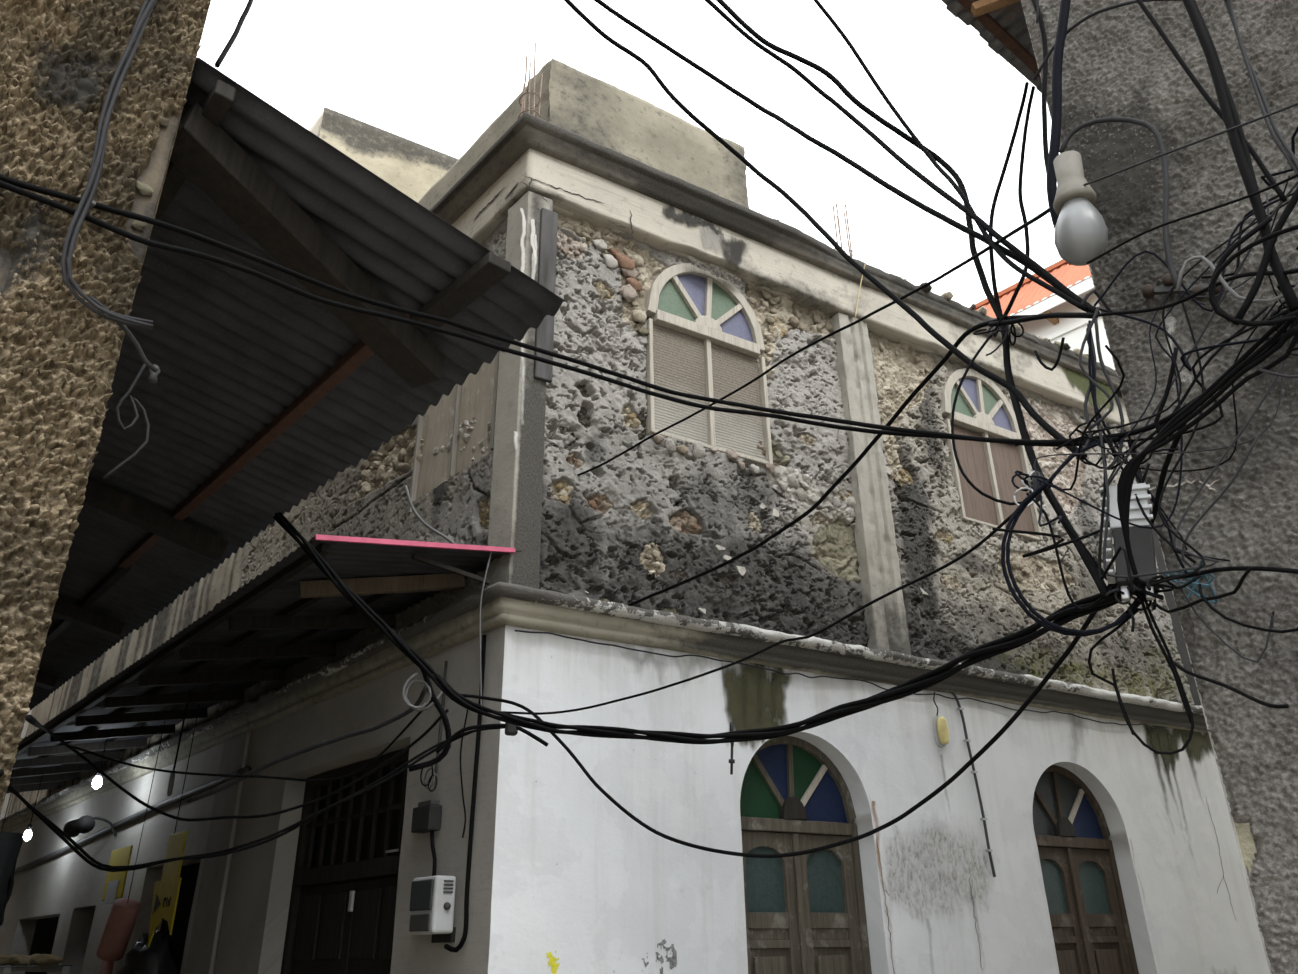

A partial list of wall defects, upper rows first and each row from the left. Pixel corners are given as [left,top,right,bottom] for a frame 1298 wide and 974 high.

water stain [41,43,113,110]
water stain [663,204,746,267]
spalling [557,214,665,336]
spalling [686,255,834,385]
spalling [753,440,861,584]
flaking render [715,545,746,589]
water stain [722,662,790,747]
water stain [1144,725,1213,789]
peeling [642,939,677,974]